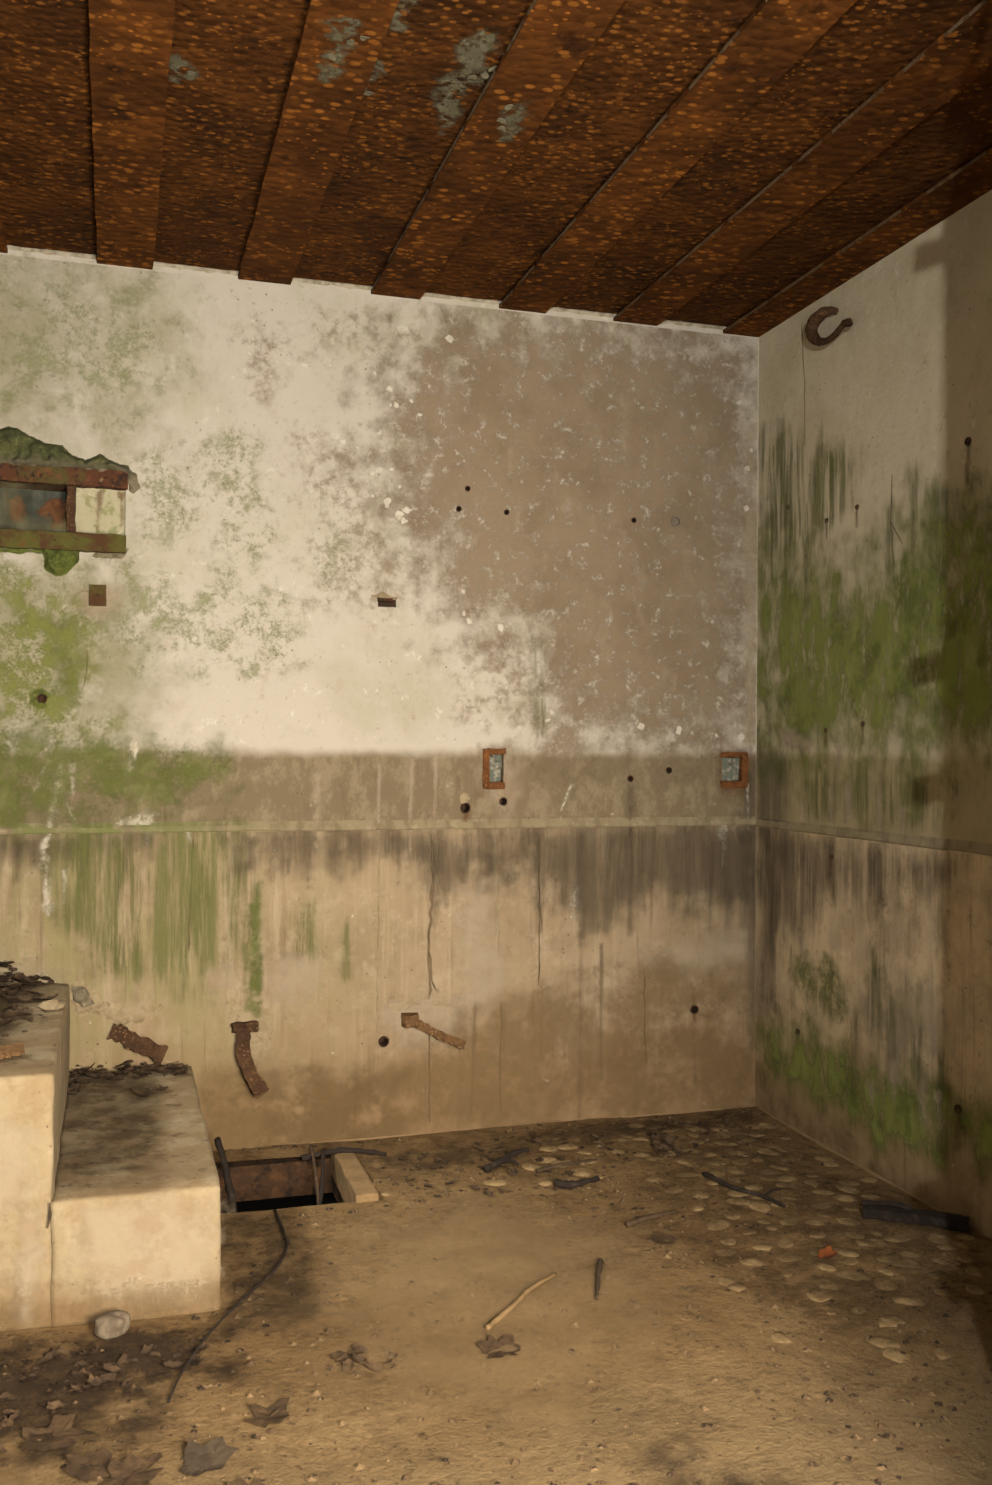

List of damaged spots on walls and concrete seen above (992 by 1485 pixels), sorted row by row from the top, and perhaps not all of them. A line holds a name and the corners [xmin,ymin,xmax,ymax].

spalling [0,426,141,494]
spalling [42,548,129,577]
damp [128,741,138,772]
damp [26,763,75,915]
damp [119,799,153,844]
damp [536,783,750,921]